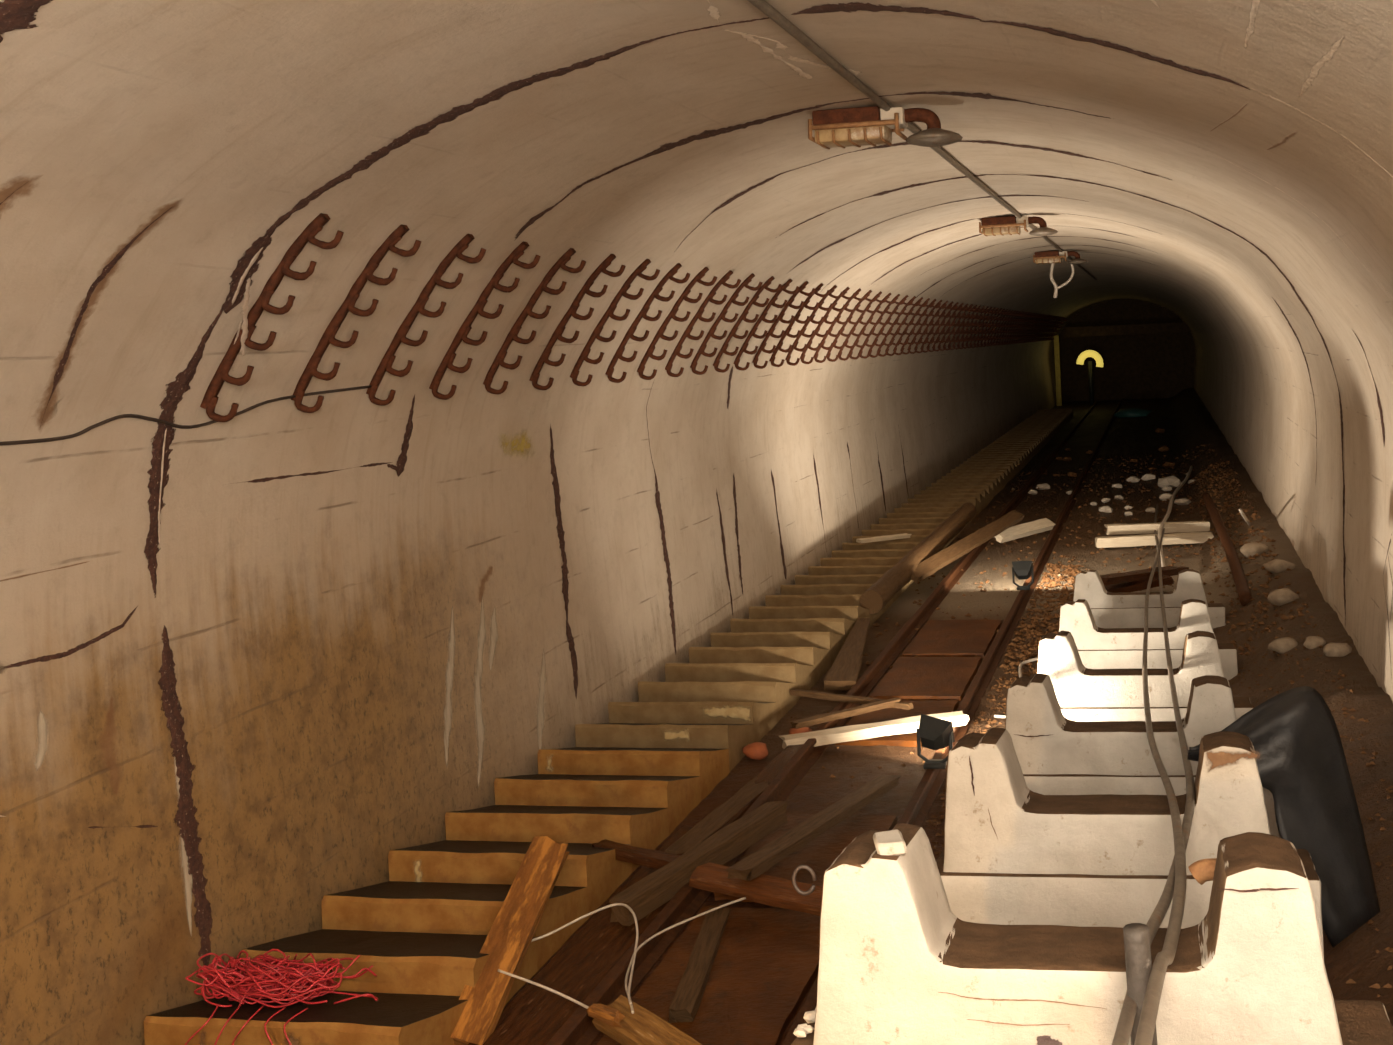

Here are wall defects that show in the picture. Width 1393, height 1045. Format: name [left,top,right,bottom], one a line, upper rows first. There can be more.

crack [0,0,1393,699]
crack [133,626,213,966]
crack [969,756,998,839]
crack [1218,886,1299,894]